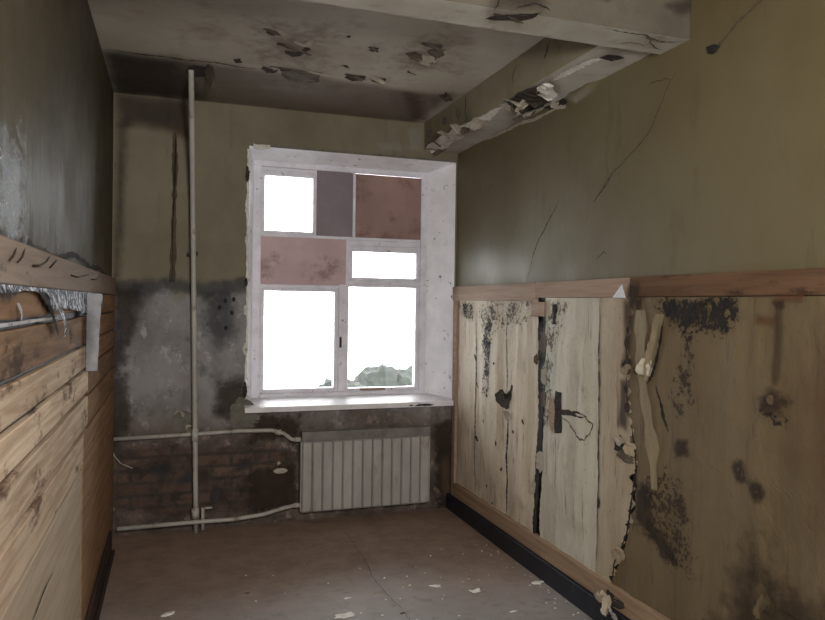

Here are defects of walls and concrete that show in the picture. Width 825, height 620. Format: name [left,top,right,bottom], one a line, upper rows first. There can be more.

peeling [406,42,445,67]
crack [706,0,762,54]
spalling [115,55,625,515]
damp [621,302,633,372]
damp [655,297,739,418]
damp [113,378,129,449]
damp [460,301,568,534]
damp [618,381,628,428]
peeling [613,435,636,464]
damp [759,392,788,426]
damp [634,464,693,580]
peeling [594,589,625,620]